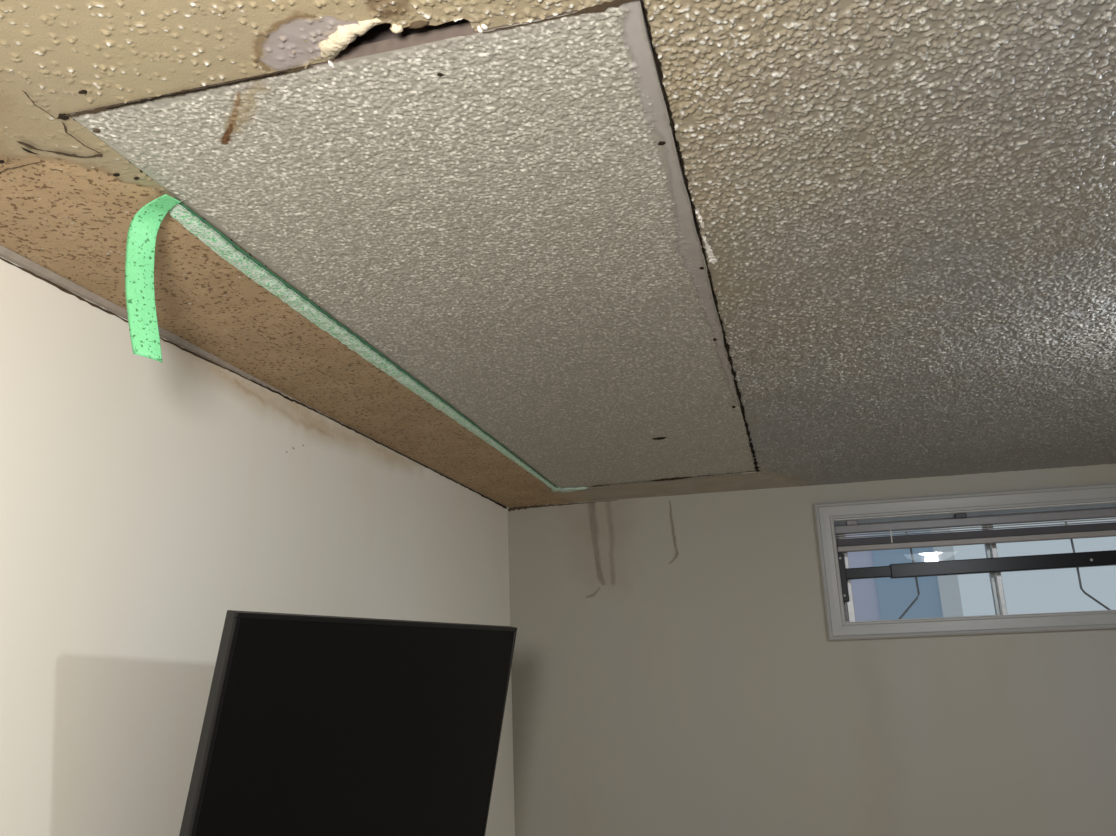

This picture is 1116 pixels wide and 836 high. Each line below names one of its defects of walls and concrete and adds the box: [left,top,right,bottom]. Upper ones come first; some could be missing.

peeling [255,15,358,71]
peeling [385,20,443,34]
water stain [0,157,163,310]
water stain [154,212,794,584]